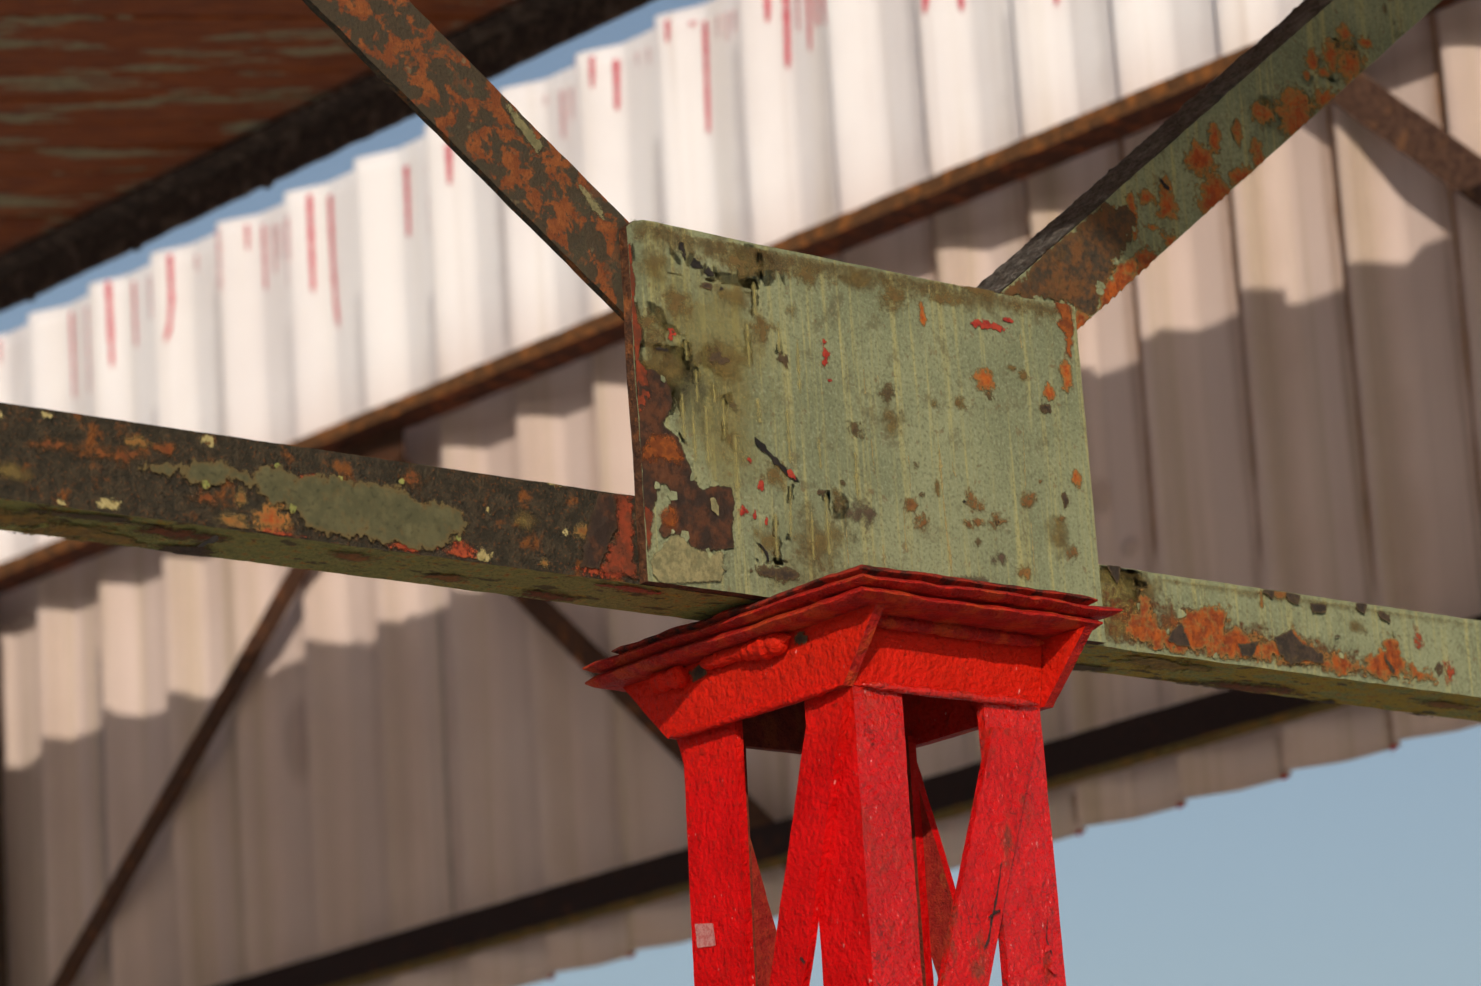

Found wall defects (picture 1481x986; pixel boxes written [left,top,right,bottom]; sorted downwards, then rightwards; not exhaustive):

rust [1430,12,1445,131]
peeling [678,242,723,290]
rust [574,22,1374,595]
rust [1448,186,1481,514]
rust [28,435,176,468]
rust [0,486,305,557]
peeling [138,434,470,551]
rust [420,541,477,582]
peeling [477,548,493,562]
peeling [650,535,727,584]
peeling [710,497,719,516]
rust [1072,577,1478,716]